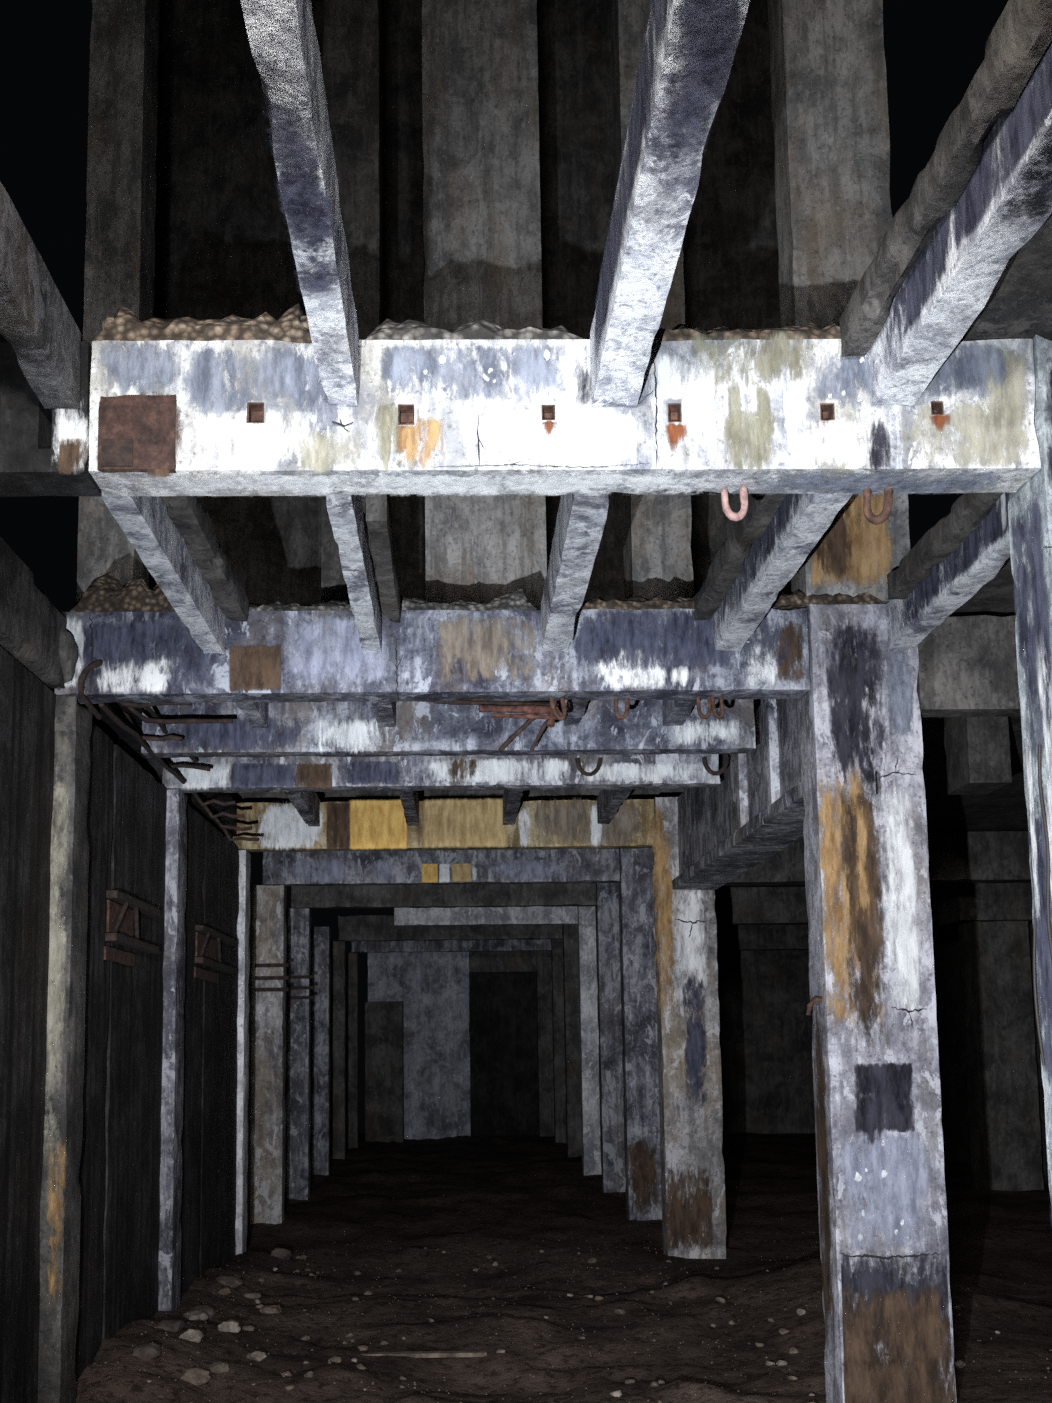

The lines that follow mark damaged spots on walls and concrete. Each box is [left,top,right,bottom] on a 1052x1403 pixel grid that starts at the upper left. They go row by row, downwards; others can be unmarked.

corrosion [667,423,686,447]
corrosion [931,414,950,429]
corrosion [147,469,169,478]
corrosion [811,493,893,585]
corrosion [78,661,102,720]
corrosion [419,699,567,752]
water stain [826,626,919,1013]
water stain [841,1255,956,1403]